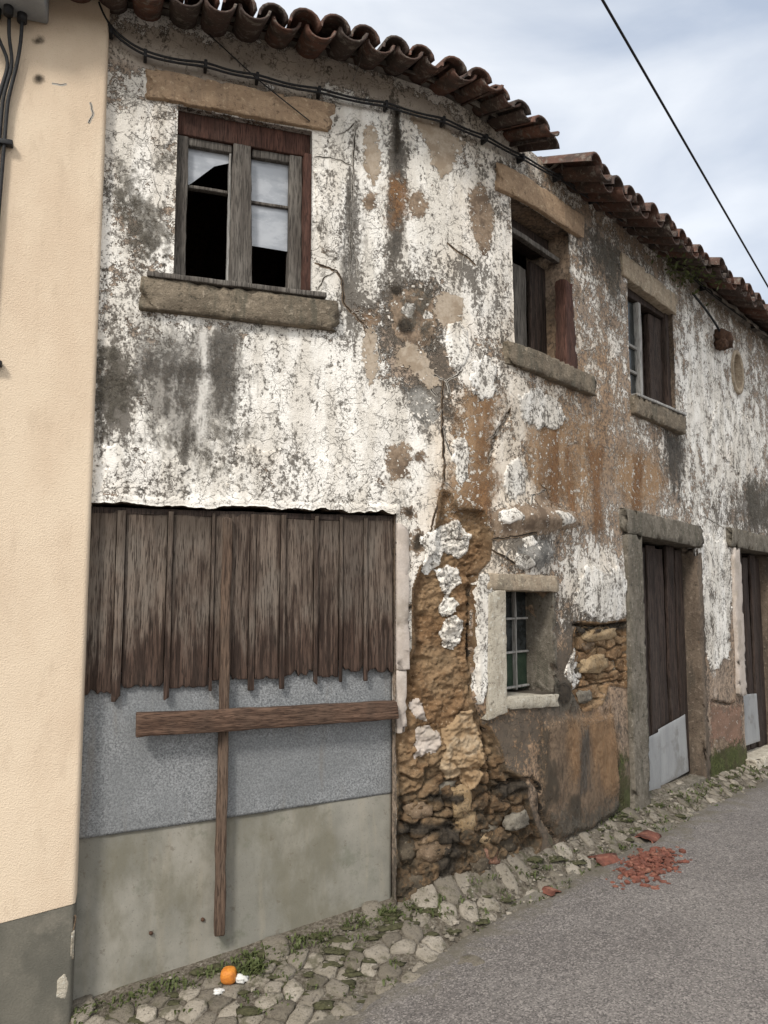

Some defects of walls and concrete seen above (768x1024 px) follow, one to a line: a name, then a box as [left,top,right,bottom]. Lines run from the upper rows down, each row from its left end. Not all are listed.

damp [114,161,173,259]
crack [314,122,381,358]
peeling [362,122,383,212]
peeling [405,191,429,218]
peeling [403,110,466,179]
peeling [467,181,495,256]
damp [96,329,257,476]
crack [422,353,466,532]
peeling [502,457,528,501]
peeling [517,387,567,430]
peeling [470,573,492,704]
spalling [564,564,627,712]